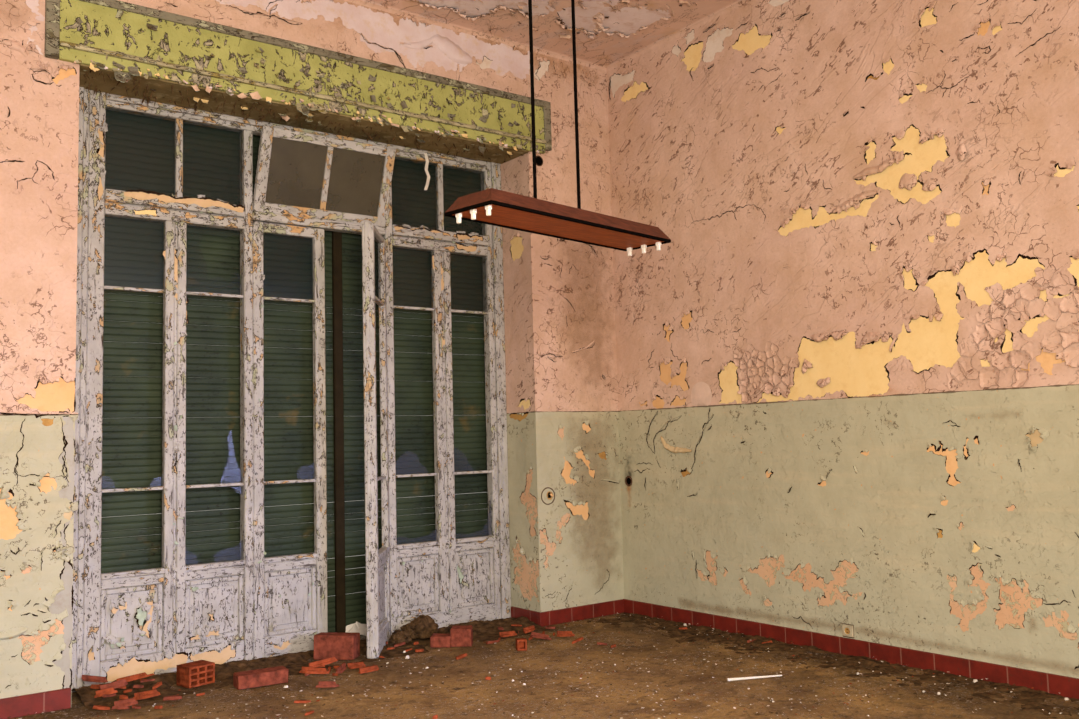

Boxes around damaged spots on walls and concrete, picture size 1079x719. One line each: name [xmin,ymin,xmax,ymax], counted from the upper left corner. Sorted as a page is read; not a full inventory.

crack [2,38,61,87]
flaking render [216,0,697,81]
peeling [672,22,773,72]
crack [0,147,55,189]
peeling [778,124,950,237]
peeling [718,248,1079,404]
crack [947,267,1079,391]
crack [0,410,71,485]
crack [601,407,713,497]
crack [10,519,61,571]
peeling [512,466,590,603]
peeling [947,540,1079,649]